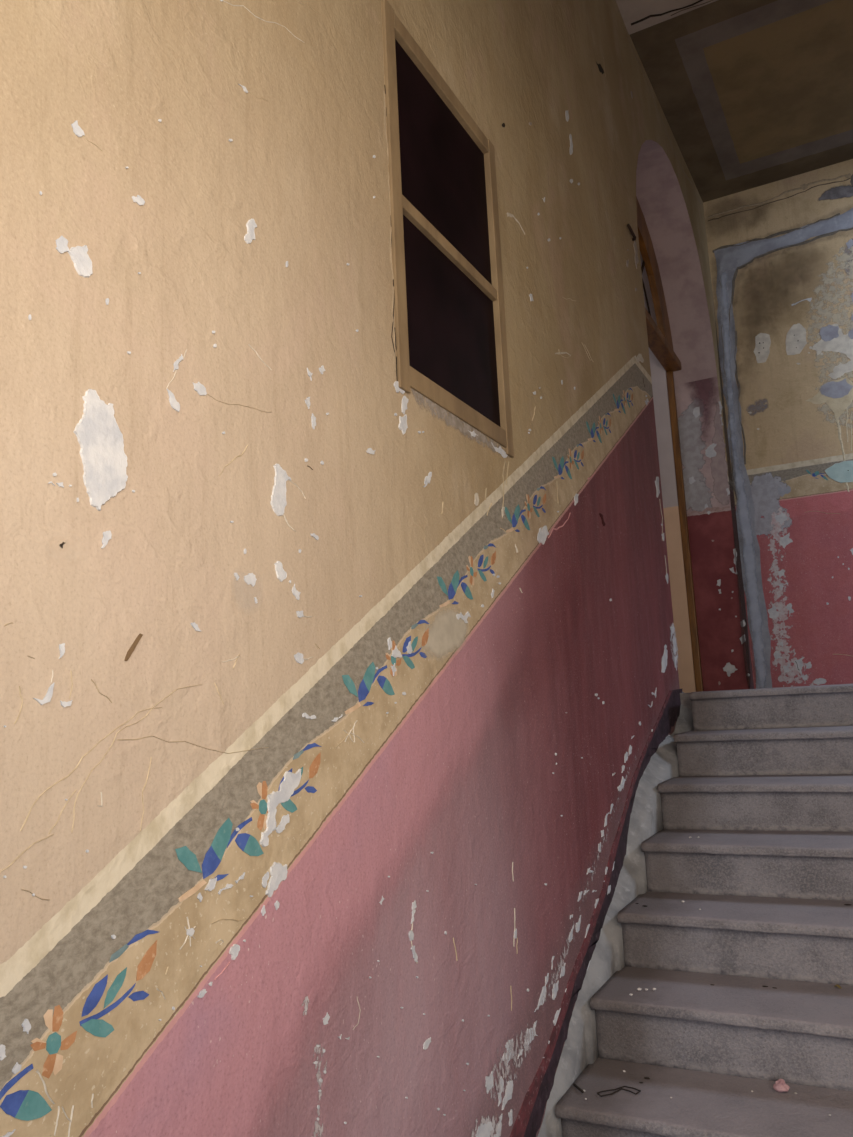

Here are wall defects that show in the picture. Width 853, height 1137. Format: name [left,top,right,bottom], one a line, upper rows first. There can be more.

crack [631,0,713,26]
peeling [819,185,853,201]
peeling [55,236,93,278]
peeling [394,381,424,434]
peeling [48,389,135,511]
peeling [270,463,306,532]
peeling [259,769,301,847]
peeling [197,872,245,902]
peeling [250,862,288,916]
peeling [471,721,653,1137]